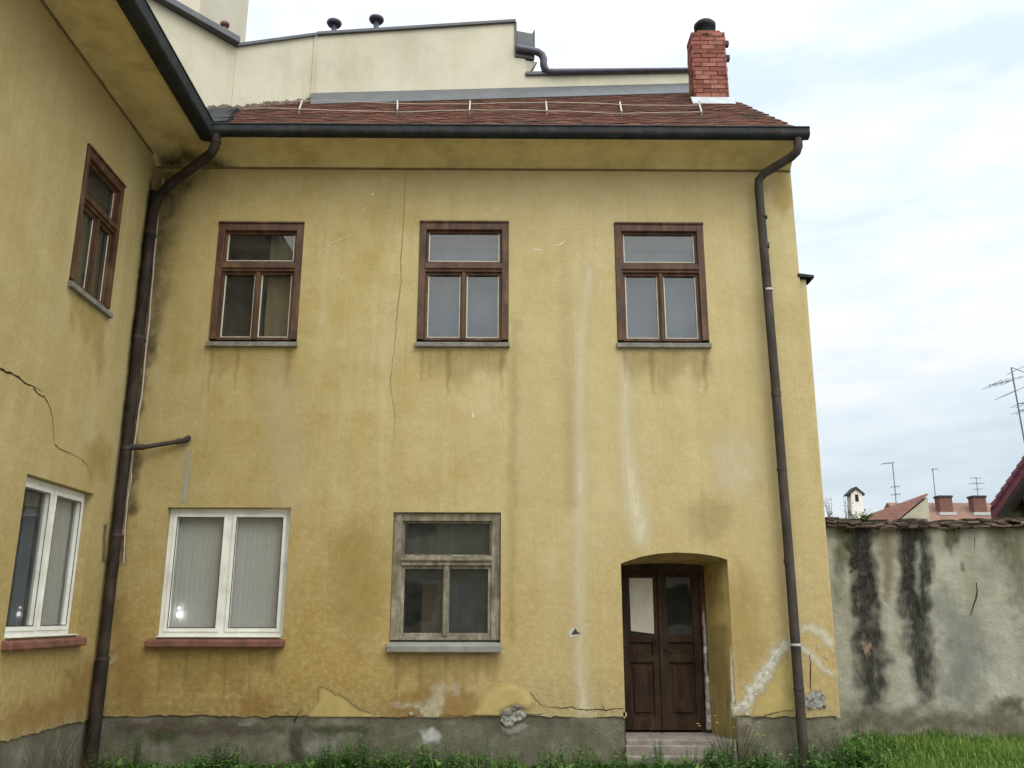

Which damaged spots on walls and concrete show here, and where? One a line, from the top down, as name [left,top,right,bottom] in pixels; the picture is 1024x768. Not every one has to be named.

water stain [124,152,224,524]
crack [0,368,88,467]
water stain [626,439,645,542]
crack [287,686,371,722]
spalling [500,704,527,733]
crack [526,692,623,715]
flaking render [731,624,833,715]